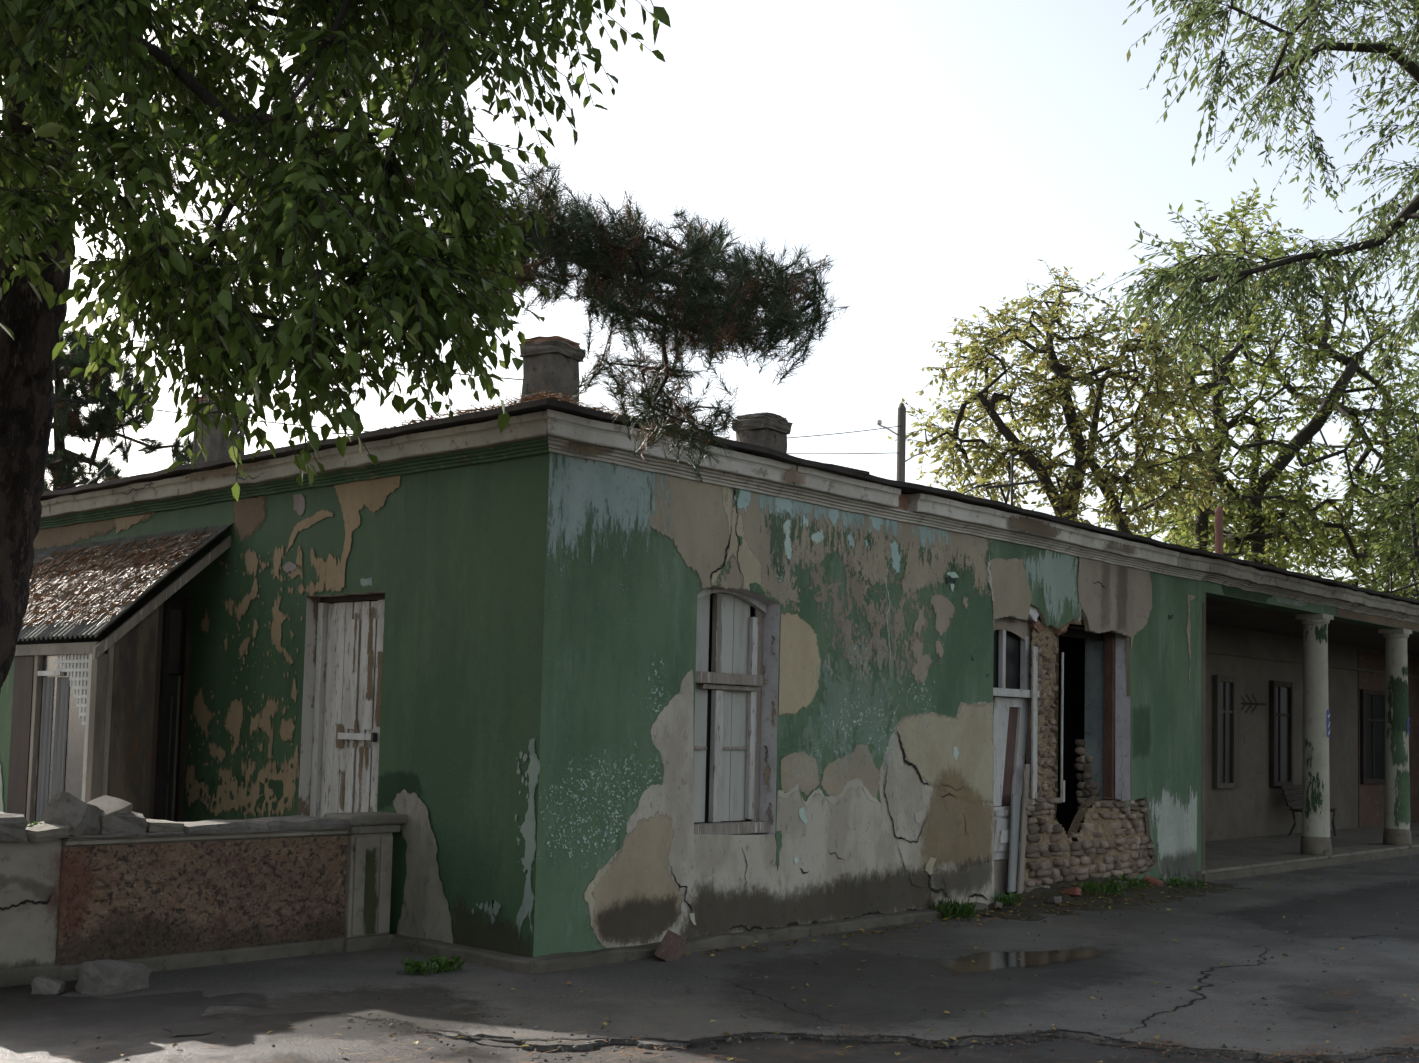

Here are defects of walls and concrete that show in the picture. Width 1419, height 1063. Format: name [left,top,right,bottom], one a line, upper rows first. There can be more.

crack [0,893,55,911]
peeling [185,475,401,819]
peeling [472,899,501,924]
crack [671,867,696,925]
peeling [515,488,995,948]
leakage [598,859,992,943]
crack [729,731,988,933]
spalling [1020,594,1197,891]